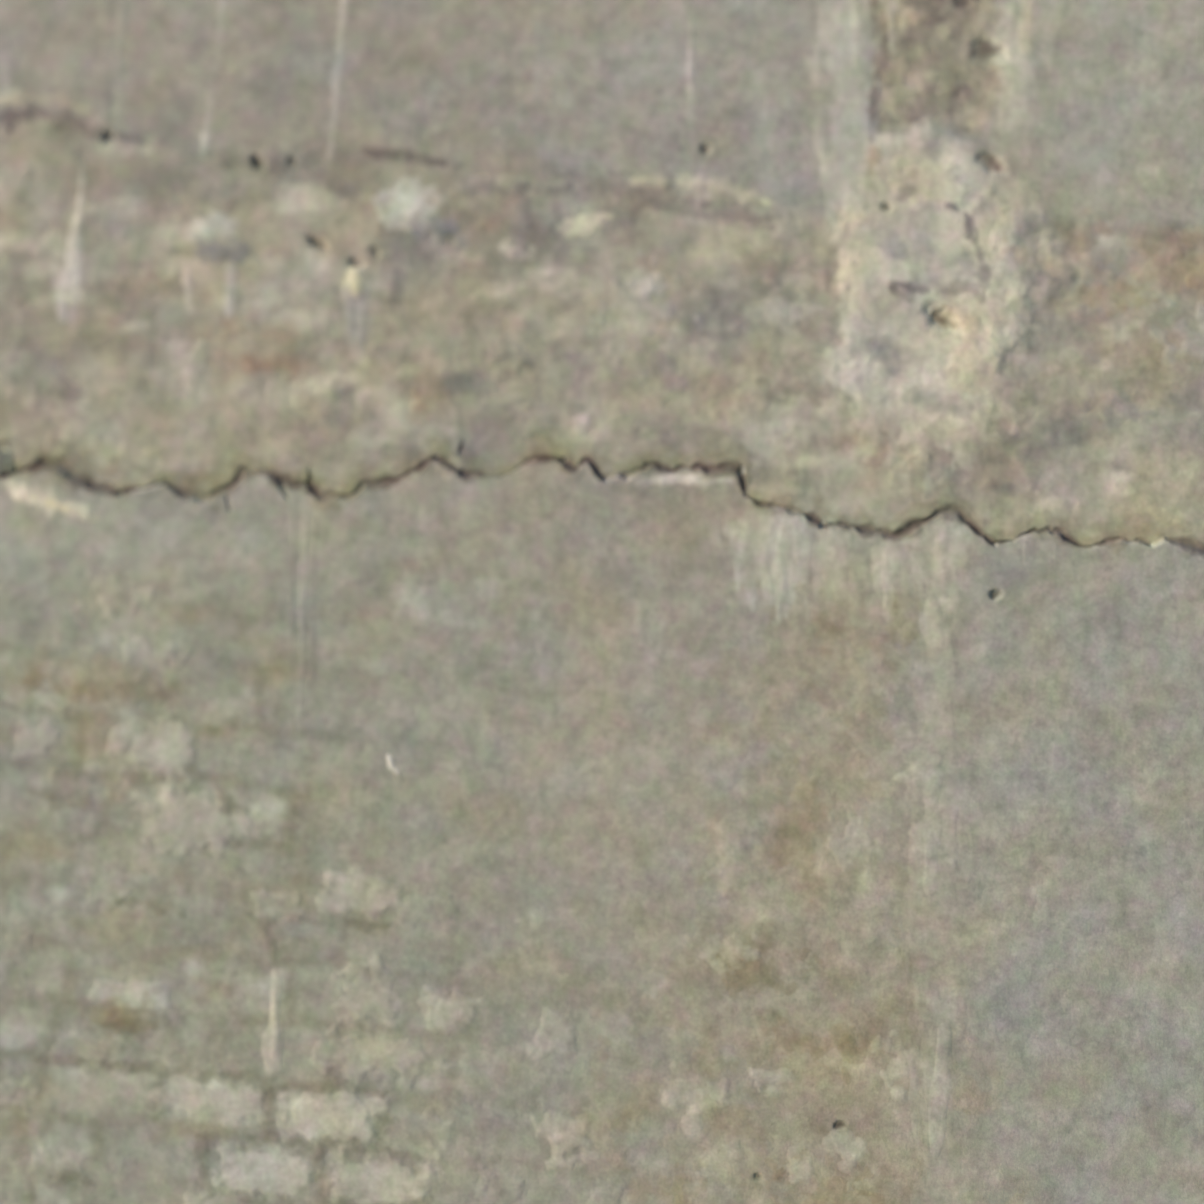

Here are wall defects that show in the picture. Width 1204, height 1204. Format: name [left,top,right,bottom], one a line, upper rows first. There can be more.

crack [0,432,1204,563]